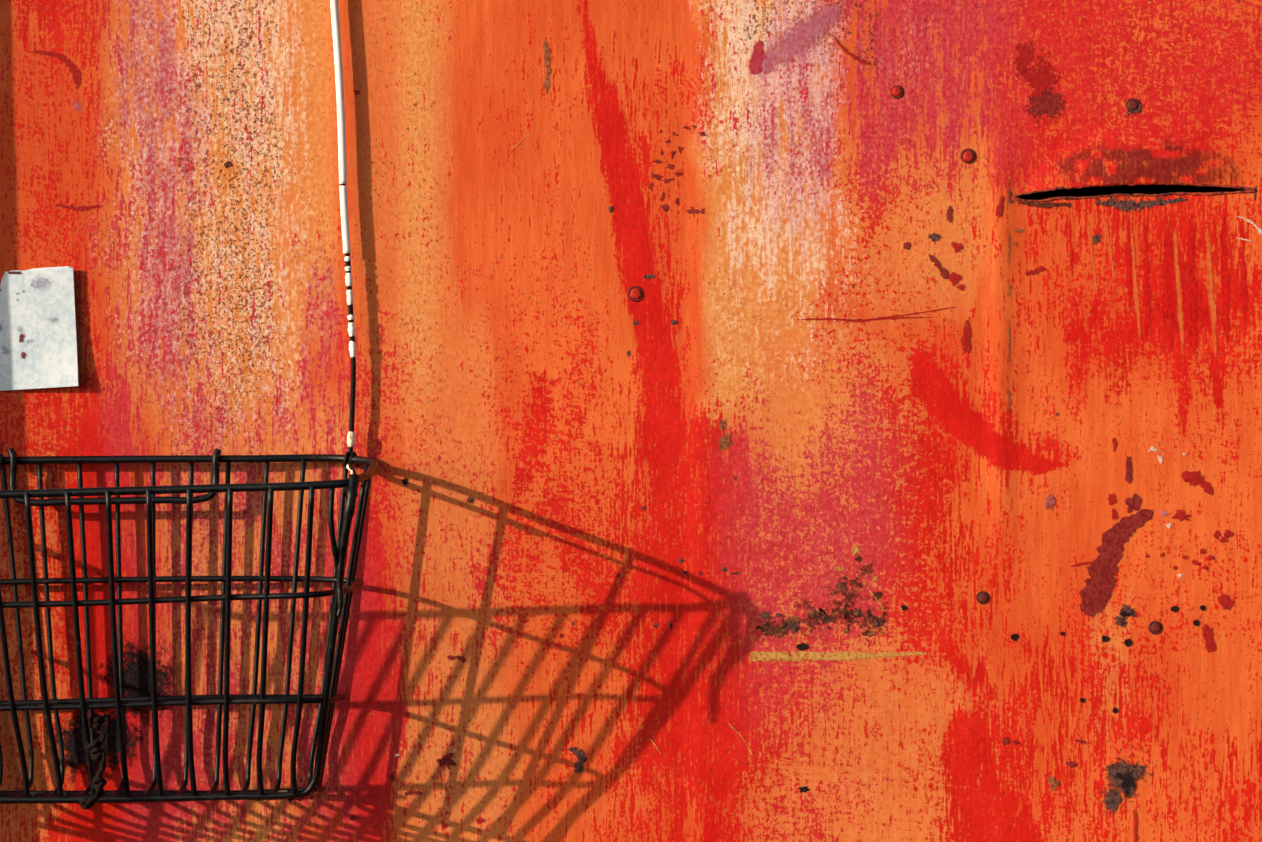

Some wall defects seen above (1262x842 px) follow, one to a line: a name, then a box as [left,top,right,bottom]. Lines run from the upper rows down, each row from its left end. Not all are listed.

corrosion [756,545,889,641]
corrosion [1098,752,1153,842]